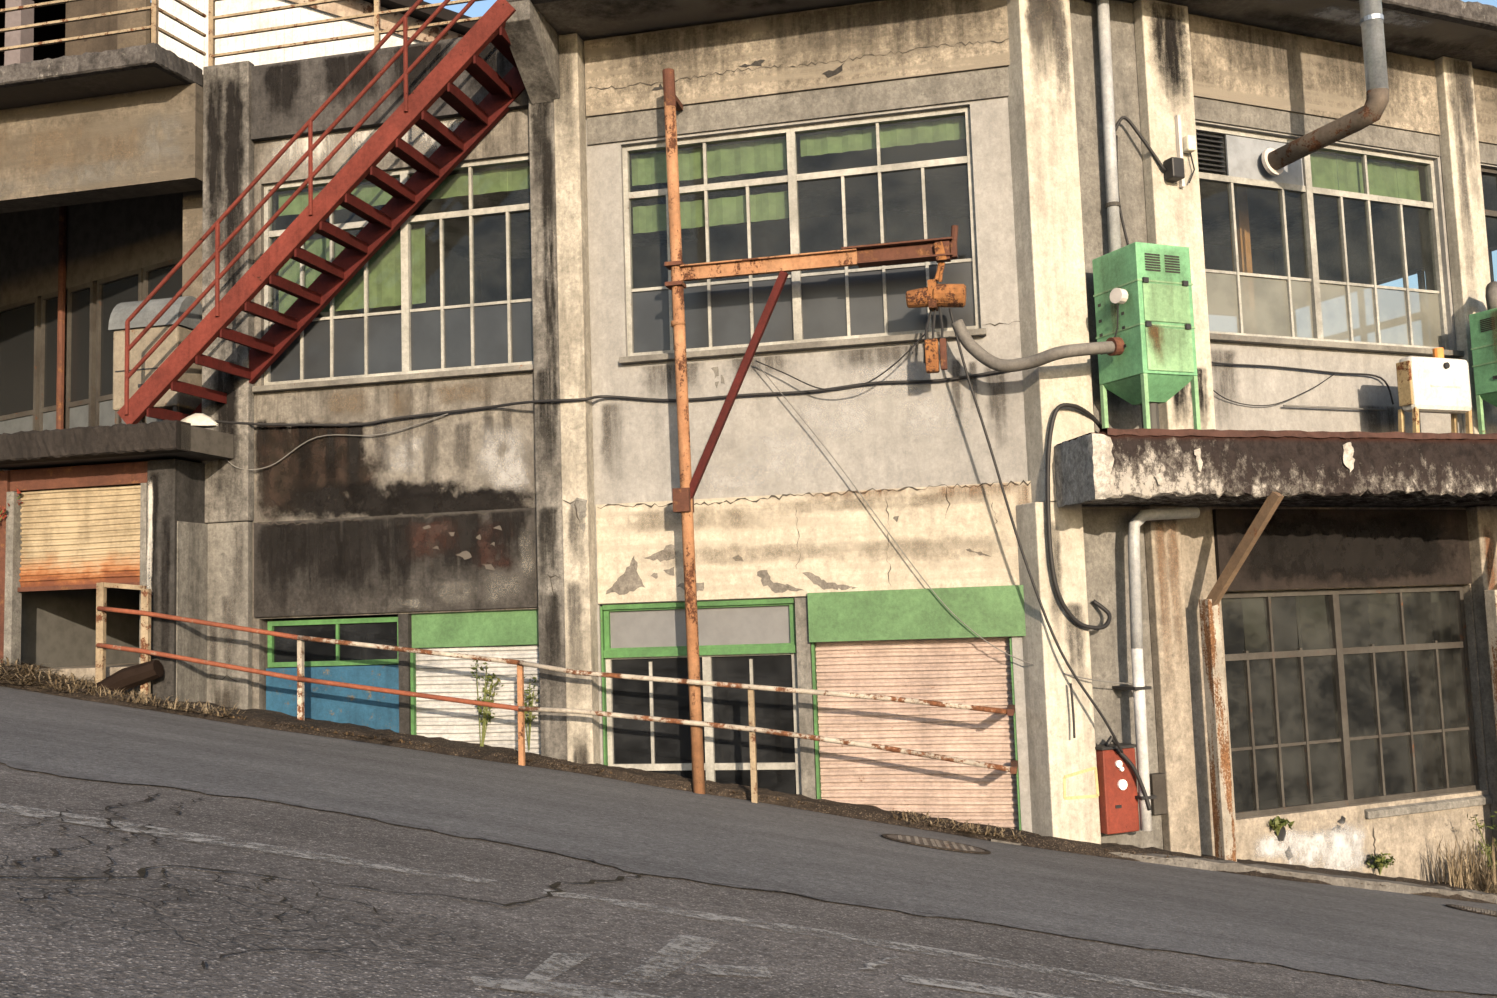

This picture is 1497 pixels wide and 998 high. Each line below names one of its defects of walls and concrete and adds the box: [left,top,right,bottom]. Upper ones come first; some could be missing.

leakage [1153,0,1184,87]
leakage [206,79,243,287]
leakage [532,44,570,262]
leakage [214,362,237,459]
leakage [1174,351,1233,415]
leakage [236,389,577,587]
peeling [411,519,513,571]
flaking render [606,544,704,595]
flaking render [733,555,857,593]
leakage [546,585,580,665]
crack [0,787,980,969]
leakage [1256,826,1364,871]